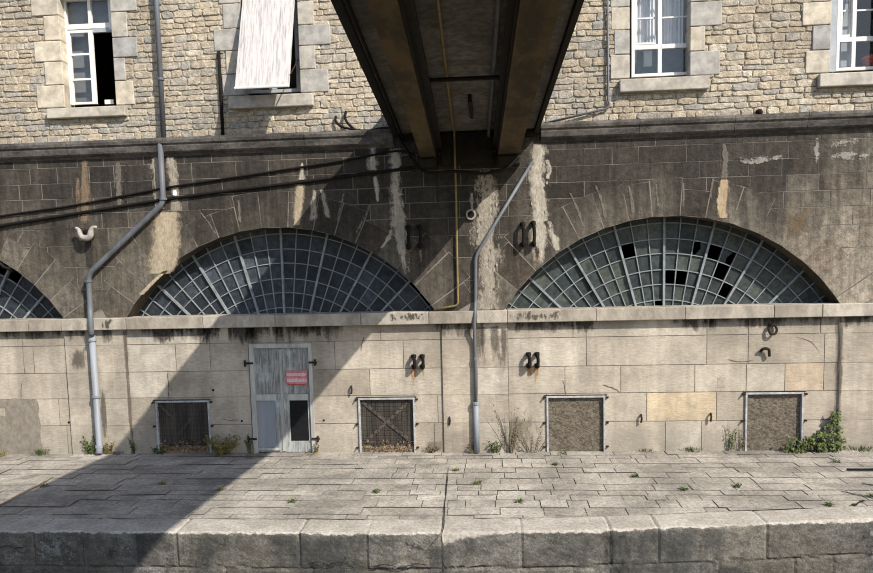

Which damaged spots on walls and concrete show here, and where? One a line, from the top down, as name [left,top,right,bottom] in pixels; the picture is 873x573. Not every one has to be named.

water stain [294,163,344,225]
water stain [356,148,409,272]
water stain [528,144,560,264]
water stain [710,143,728,218]
water stain [142,326,339,344]
water stain [437,311,593,361]